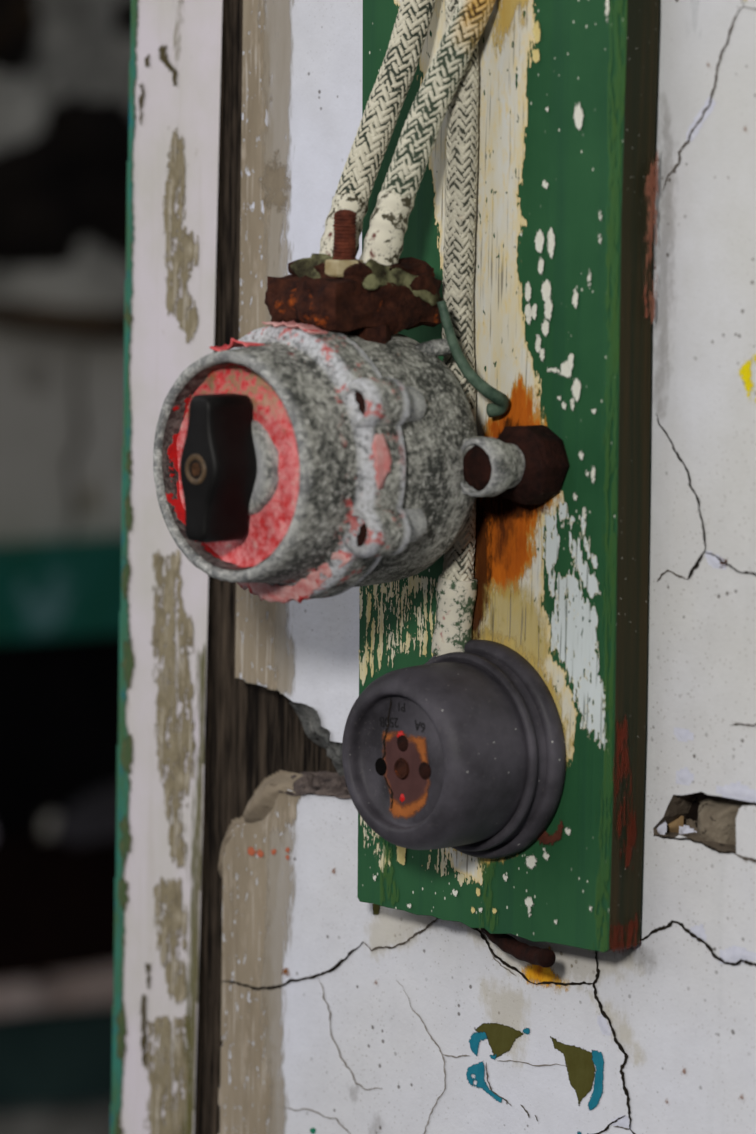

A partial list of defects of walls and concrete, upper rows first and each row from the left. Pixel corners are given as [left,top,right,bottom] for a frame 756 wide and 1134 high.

peeling [239,0,291,339]
peeling [473,0,583,437]
peeling [110,0,181,1134]
corrosion [484,374,547,439]
corrosion [472,493,568,737]
peeling [478,490,607,764]
crack [656,414,756,581]
peeling [218,583,351,1134]
crack [220,918,438,1090]
crack [397,981,568,1134]
crack [470,927,635,1134]
crack [640,920,756,967]